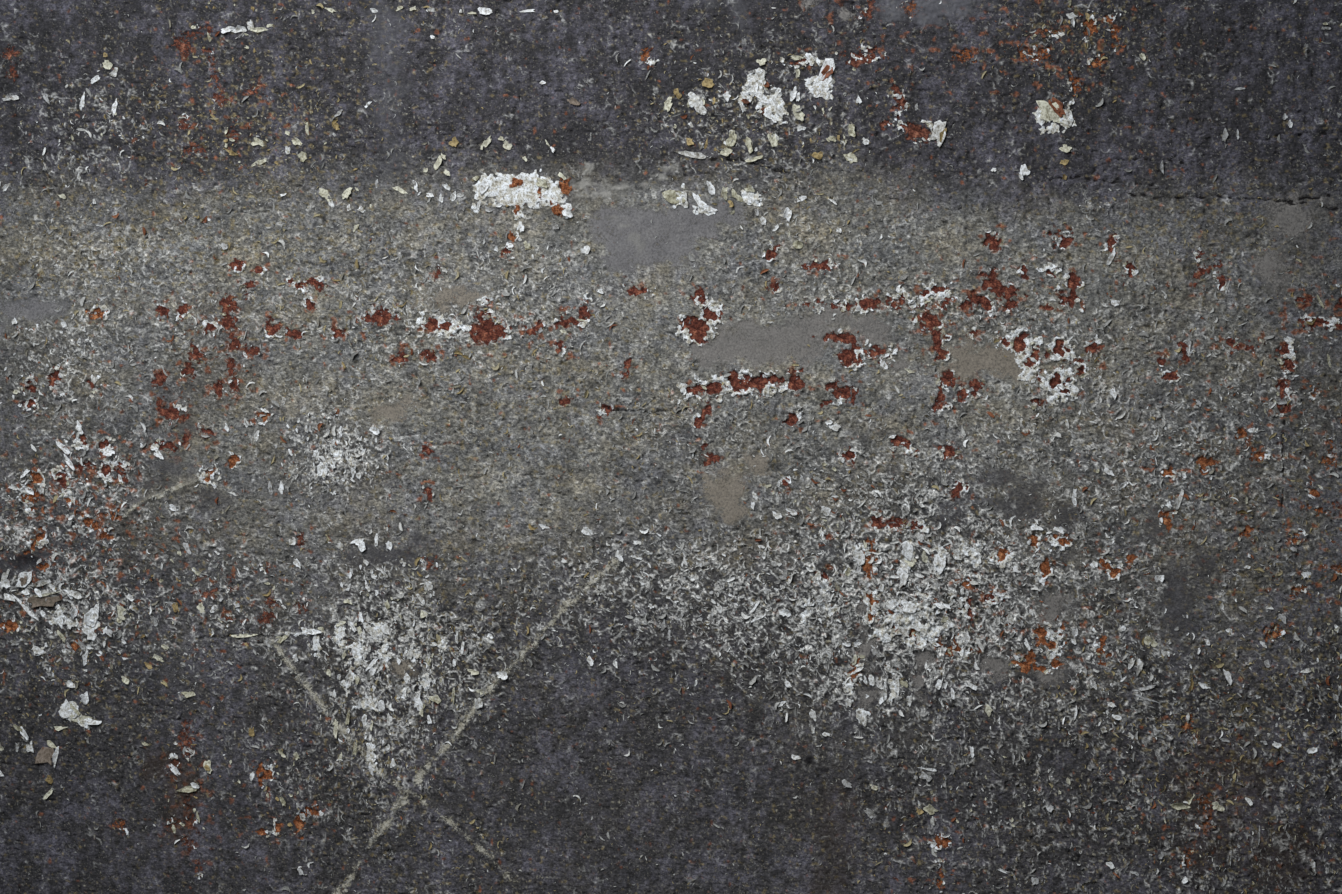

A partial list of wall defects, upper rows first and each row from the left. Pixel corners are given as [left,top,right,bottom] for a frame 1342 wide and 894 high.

peeling [930,120,954,148]
peeling [637,6,927,422]
corrosion [16,257,308,572]
corrosion [361,287,593,367]
peeling [410,325,559,409]
corrosion [675,285,725,346]
corrosion [676,366,805,466]
corrosion [799,225,1105,418]
peeling [947,402,995,447]
corrosion [1213,284,1342,417]
peeling [902,737,1042,849]
peeling [281,841,313,892]